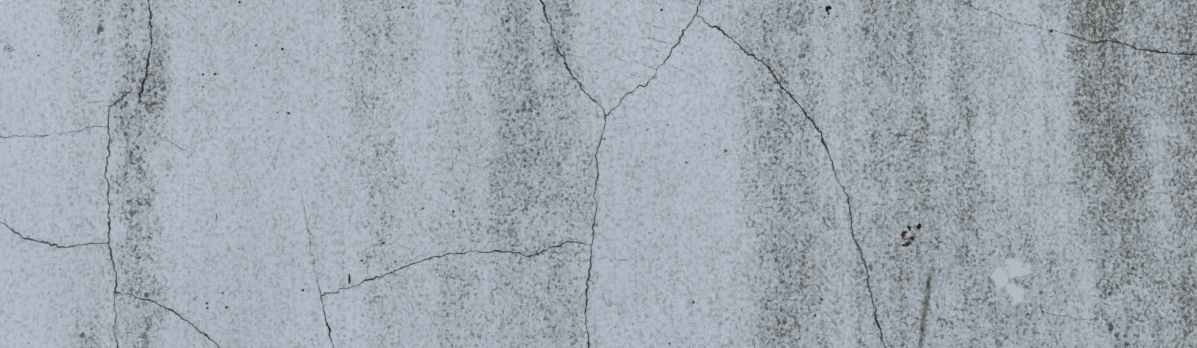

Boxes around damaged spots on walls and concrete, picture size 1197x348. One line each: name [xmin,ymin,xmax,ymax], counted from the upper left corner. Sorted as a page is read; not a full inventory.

crack [0,0,219,348]
leakage [502,3,552,167]
crack [301,0,886,348]
leakage [759,0,818,289]
leakage [863,0,928,168]
crack [961,0,1197,56]
leakage [1069,0,1143,293]
leakage [1170,0,1197,224]